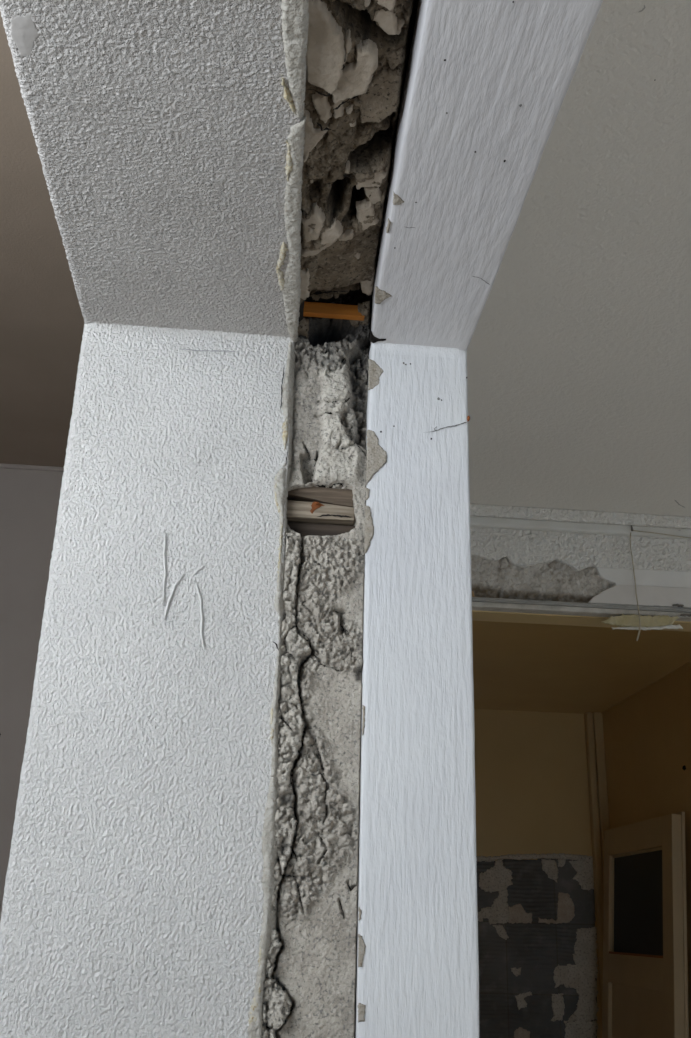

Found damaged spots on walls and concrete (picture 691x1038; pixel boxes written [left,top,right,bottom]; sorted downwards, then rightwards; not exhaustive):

spalling [247,0,419,1038]
spalling [471,556,614,603]
crack [273,544,339,908]
crack [263,929,293,1029]
flaking render [476,853,599,1038]